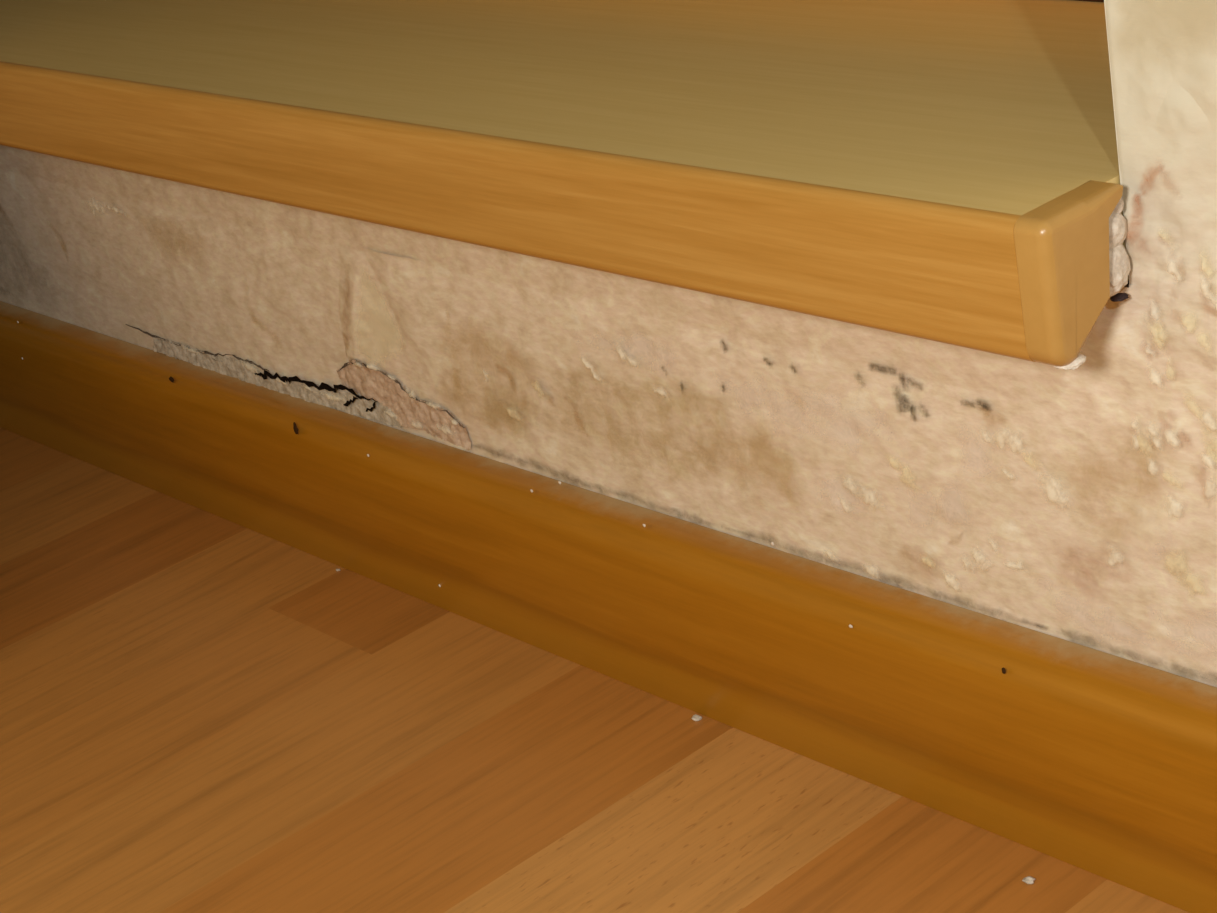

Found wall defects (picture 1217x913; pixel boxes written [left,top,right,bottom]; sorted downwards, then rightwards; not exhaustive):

crack [126,324,377,412]
flaking render [153,337,471,450]